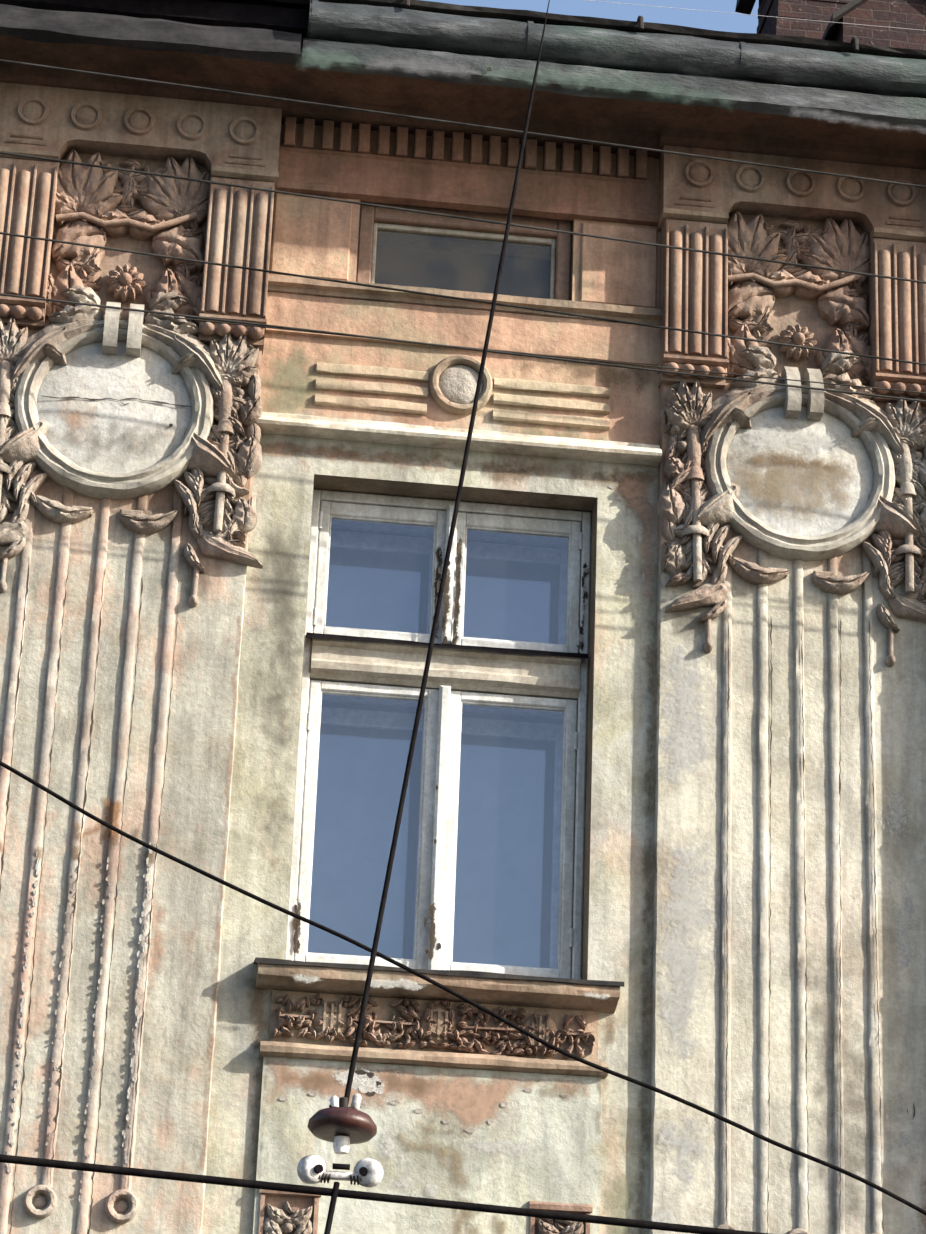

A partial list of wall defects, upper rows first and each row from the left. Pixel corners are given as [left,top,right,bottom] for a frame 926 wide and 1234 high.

crack [43,396,191,407]
water stain [737,455,849,513]
peeling [433,538,463,645]
peeling [424,902,441,960]
spalling [370,979,422,990]
peeling [274,1064,532,1126]